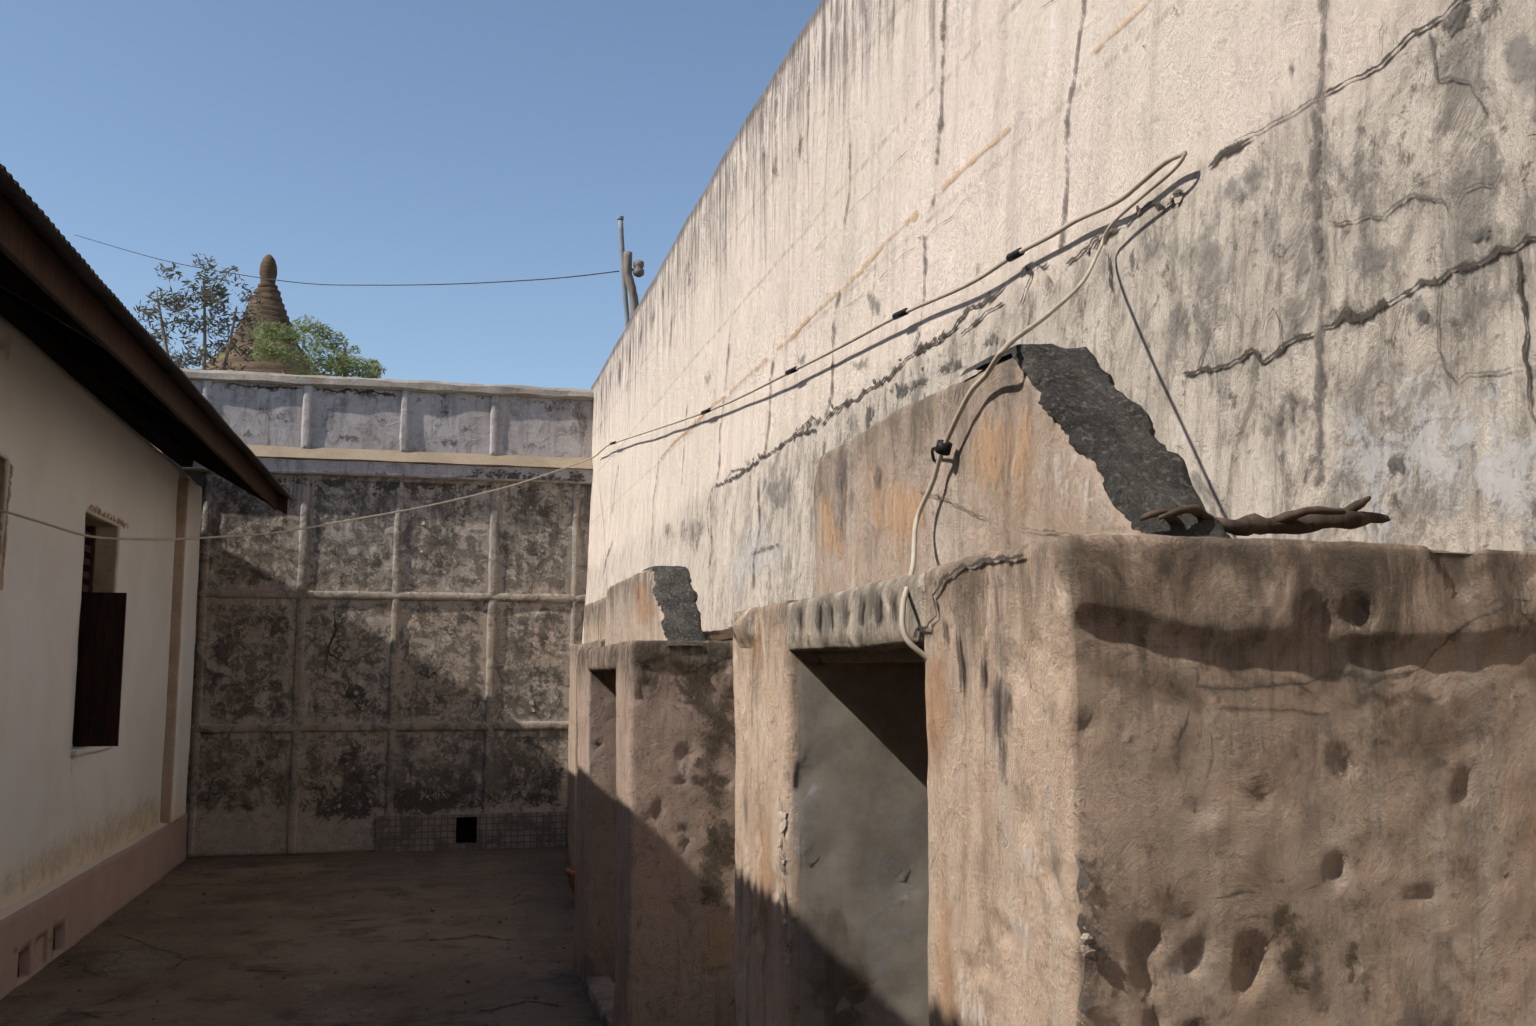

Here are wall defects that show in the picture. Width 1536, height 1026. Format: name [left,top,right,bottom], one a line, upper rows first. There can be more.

crack [1042,0,1086,290]
spalling [1066,189,1183,292]
spalling [1208,137,1252,167]
crack [1183,0,1536,485]
crack [752,361,778,589]
spalling [715,262,1047,487]
leakage [889,357,961,398]
leakage [636,647,746,904]
leakage [791,591,929,1026]
leakage [942,618,1009,779]
crack [1177,598,1528,745]
leakage [1273,903,1310,994]